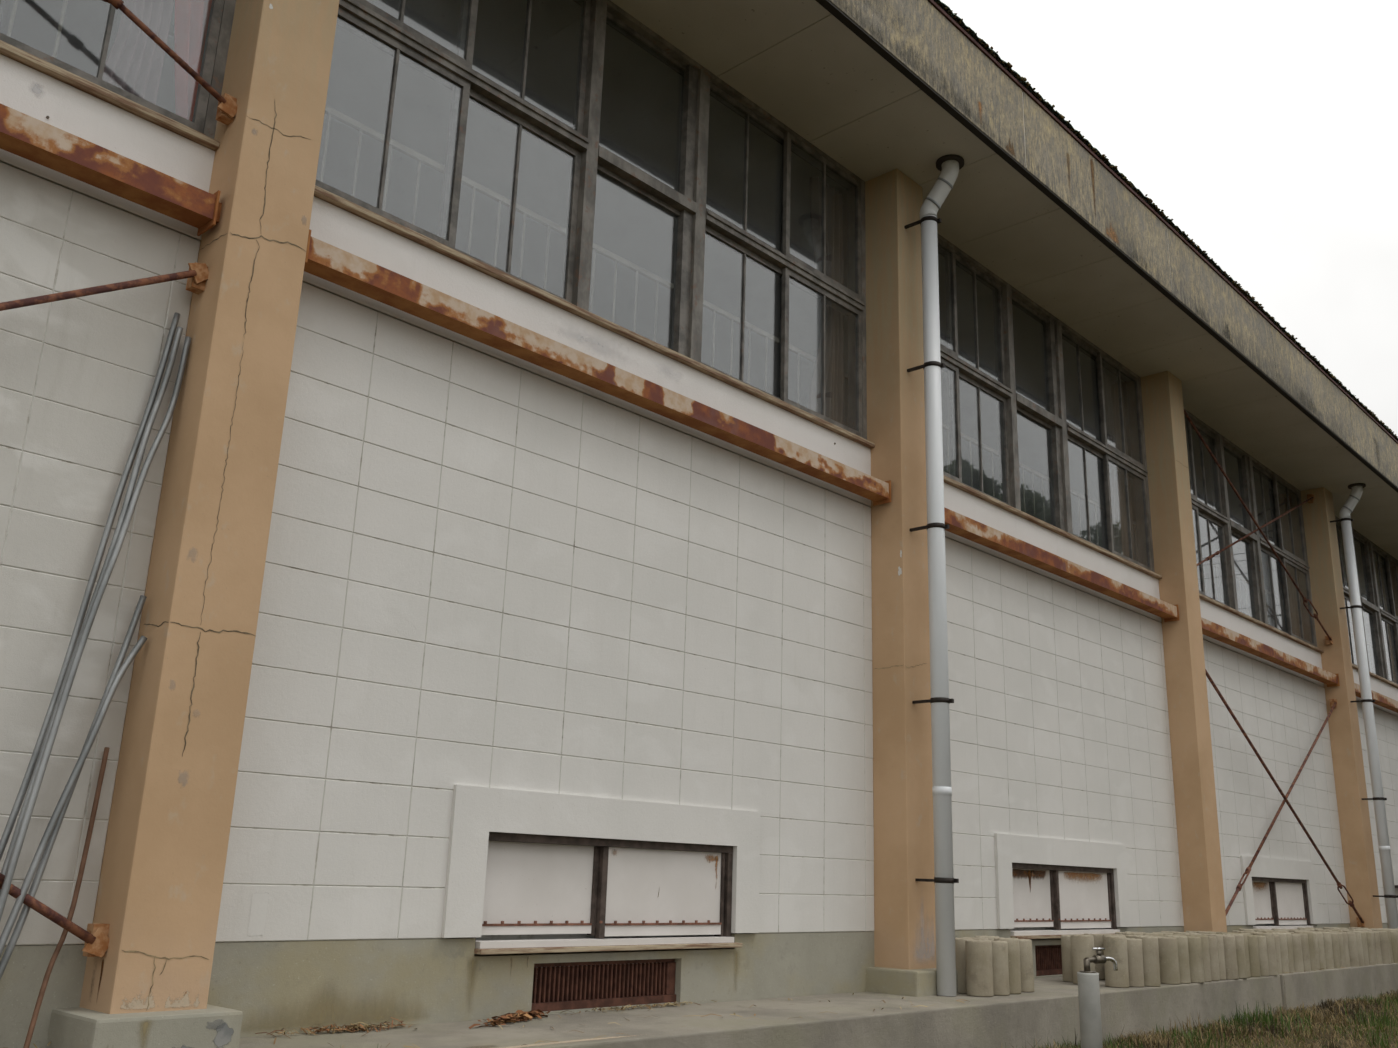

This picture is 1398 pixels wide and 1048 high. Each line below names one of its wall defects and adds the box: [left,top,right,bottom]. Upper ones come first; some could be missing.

crack [144,102,311,756]
crack [122,950,209,1011]